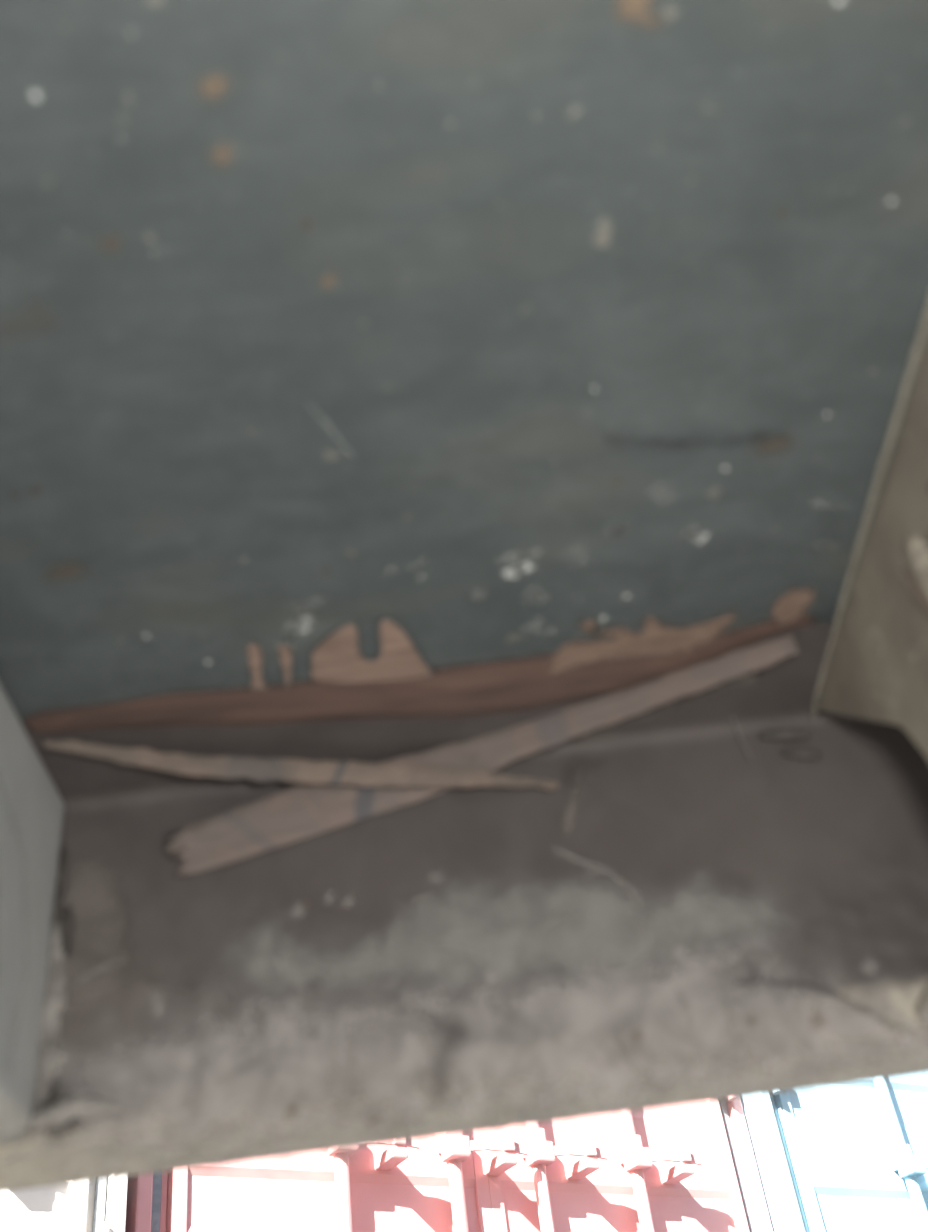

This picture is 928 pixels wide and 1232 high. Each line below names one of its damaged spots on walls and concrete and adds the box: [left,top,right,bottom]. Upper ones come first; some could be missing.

peeling [24,588,814,734]